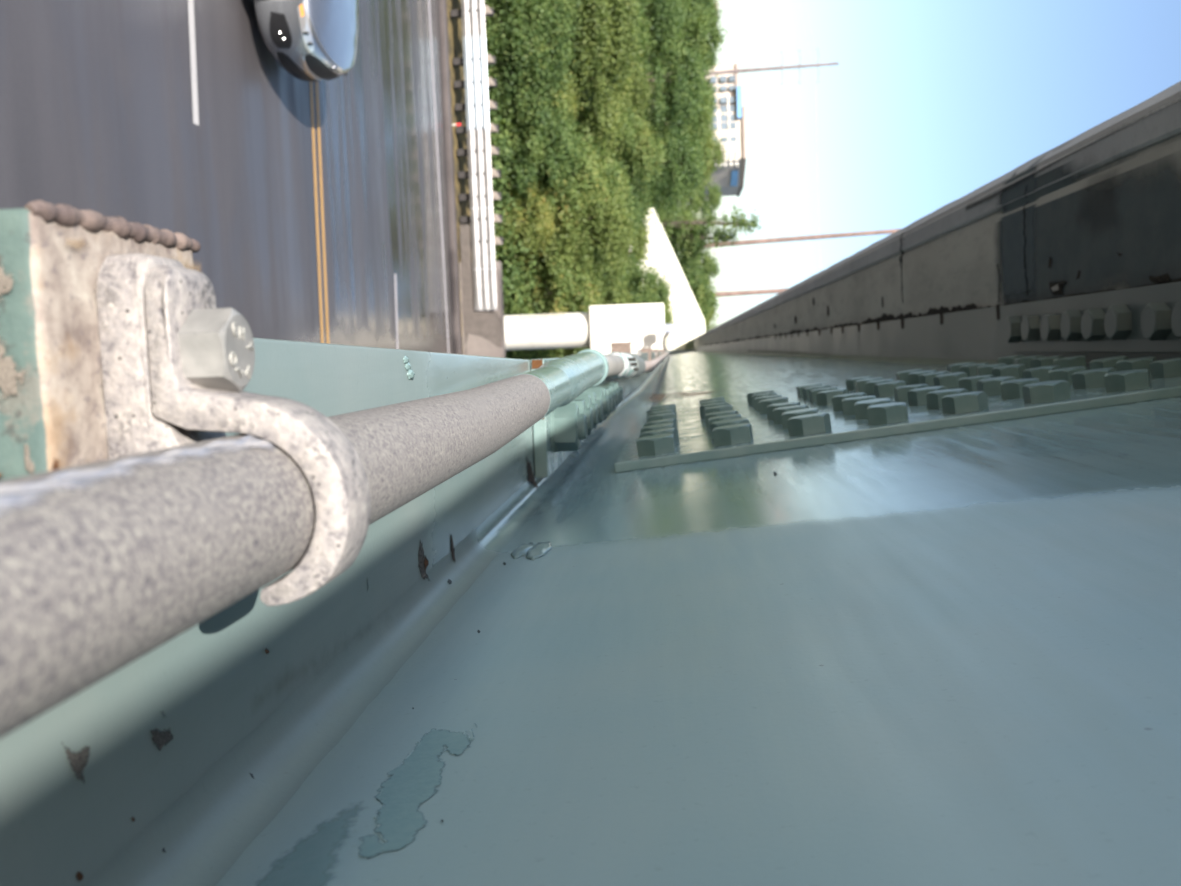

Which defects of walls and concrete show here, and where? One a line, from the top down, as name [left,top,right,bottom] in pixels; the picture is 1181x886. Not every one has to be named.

peeling [0,265,13,296]
peeling [0,342,28,398]
rust [418,541,429,581]
peeling [150,713,173,751]
peeling [359,723,477,859]